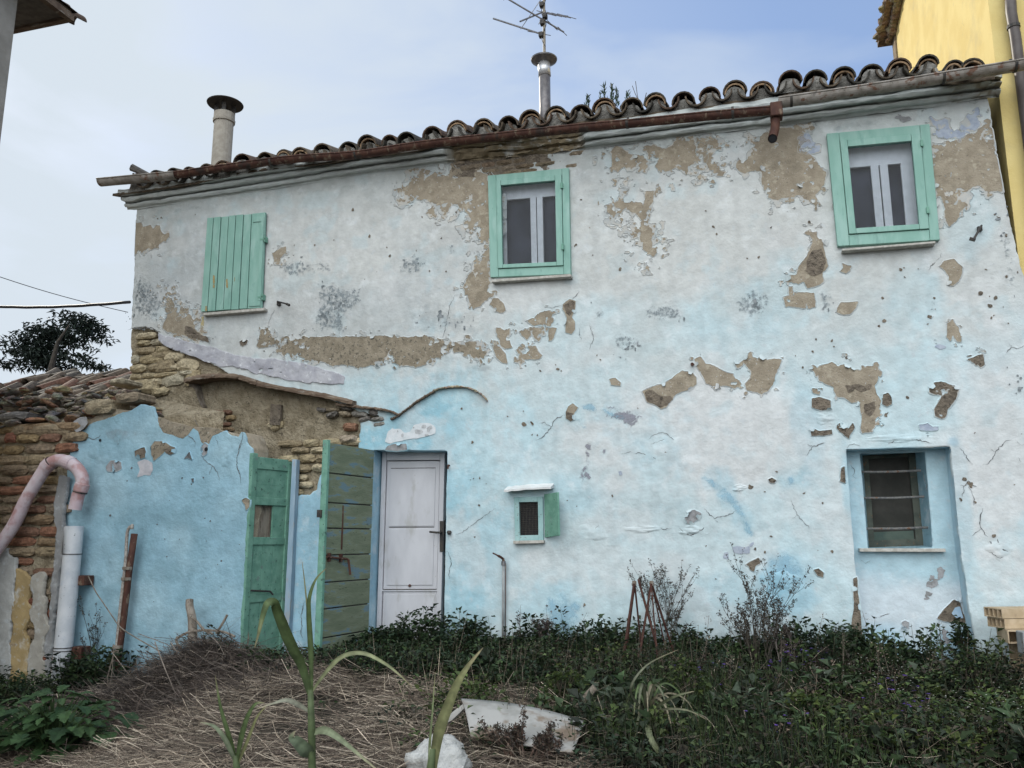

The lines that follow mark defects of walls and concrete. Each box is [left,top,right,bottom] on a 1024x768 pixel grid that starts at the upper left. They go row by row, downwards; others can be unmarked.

flaking render [134,214,171,260]
flaking render [239,162,577,372]
flaking render [592,121,853,310]
flaking render [895,100,1005,229]
flaking render [105,417,220,481]
flaking render [637,338,893,440]
flaking render [918,380,960,436]
crack [960,440,1024,558]
flaking render [936,596,966,644]